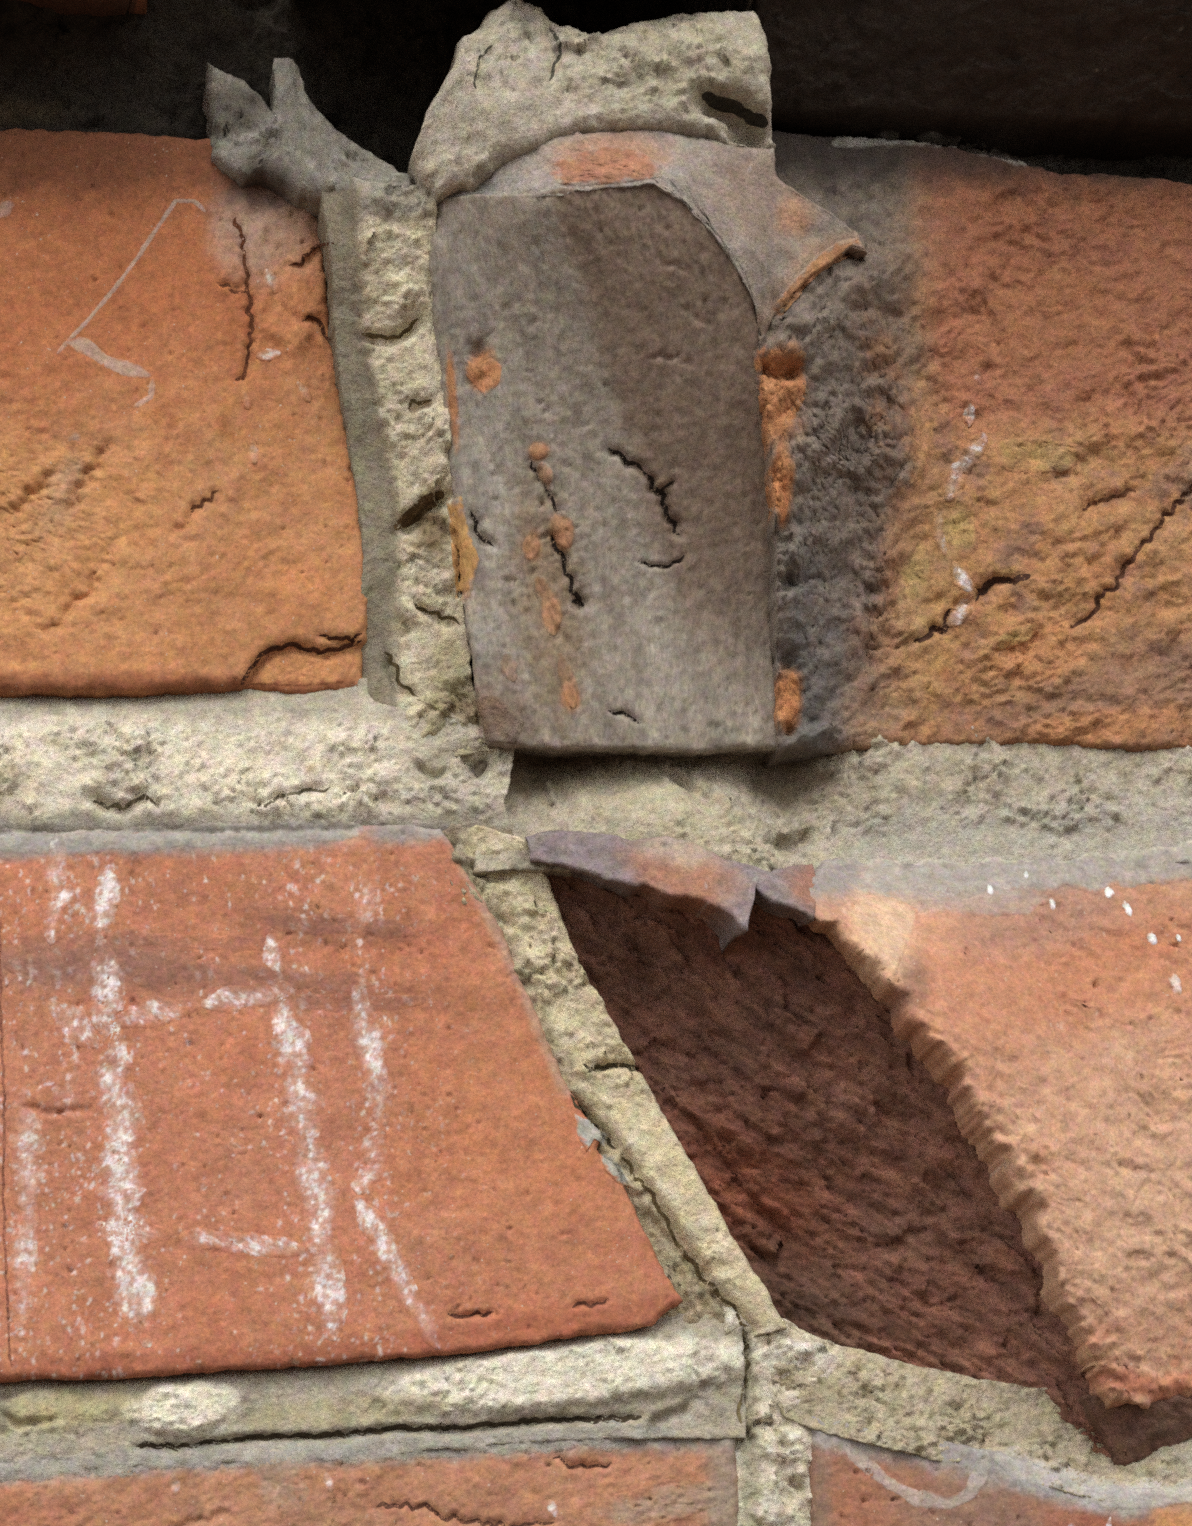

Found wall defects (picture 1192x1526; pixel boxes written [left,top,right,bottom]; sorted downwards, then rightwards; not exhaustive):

spalling [750,0,1192,162]
crack [302,315,418,340]
crack [408,399,432,409]
crack [638,555,685,568]
crack [414,603,459,624]
crack [241,633,419,697]
spalling [525,830,1127,1463]